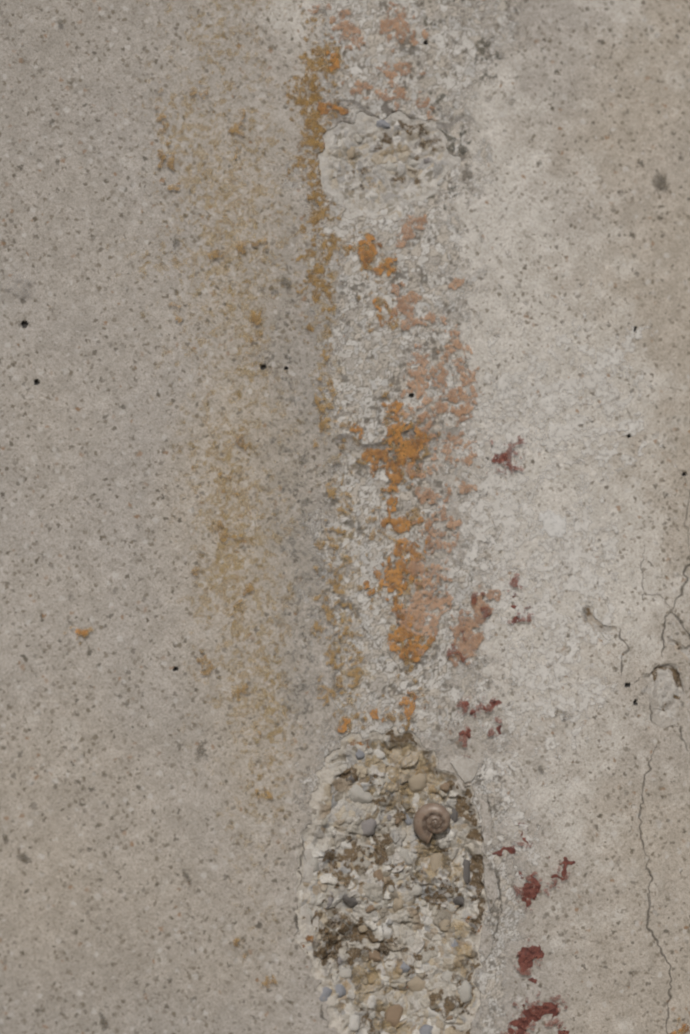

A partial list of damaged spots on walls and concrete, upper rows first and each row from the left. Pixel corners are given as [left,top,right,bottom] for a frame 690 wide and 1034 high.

corrosion [284,2,501,733]
spalling [284,0,575,1034]
crack [638,751,672,1034]
crack [661,564,690,654]